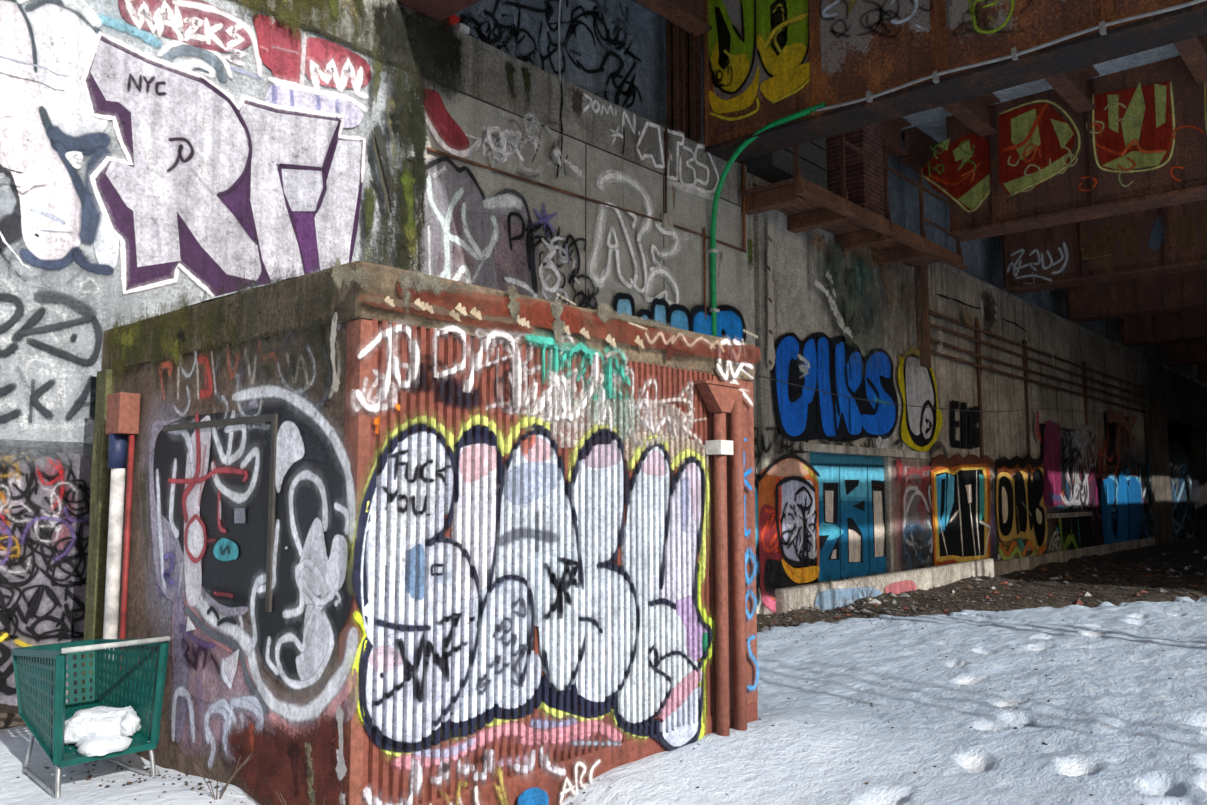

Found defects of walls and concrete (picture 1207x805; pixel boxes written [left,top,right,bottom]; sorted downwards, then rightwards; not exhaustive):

damp [354,0,466,260]